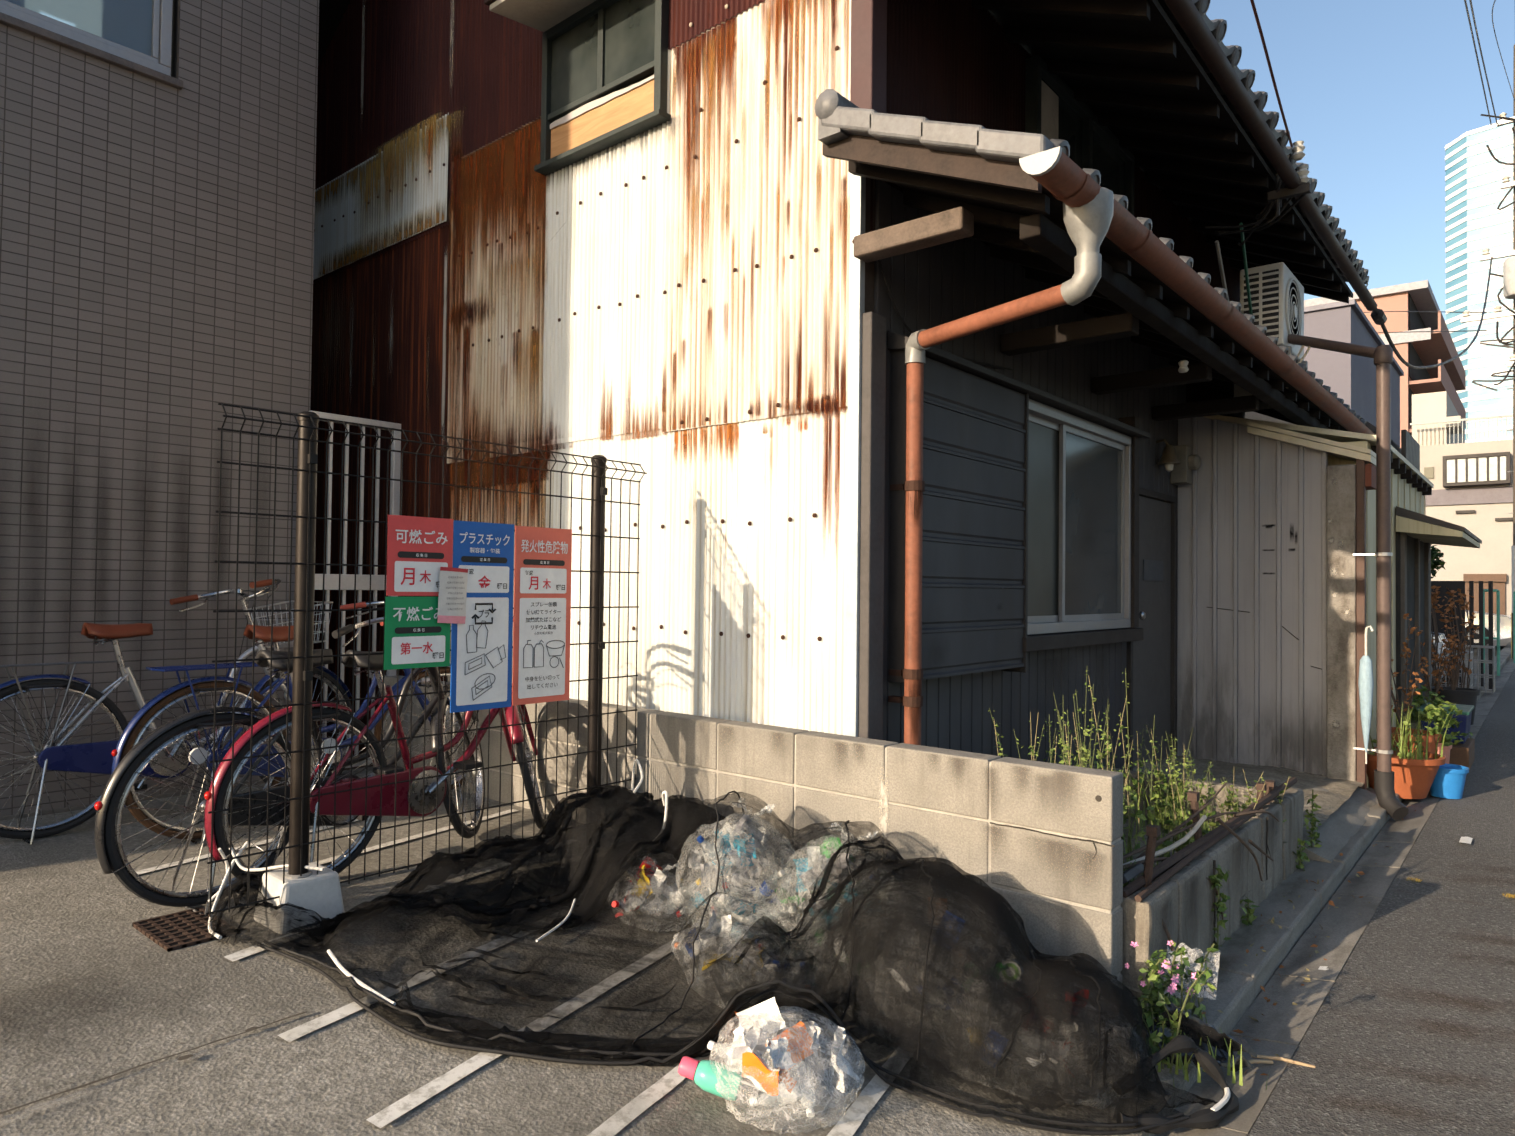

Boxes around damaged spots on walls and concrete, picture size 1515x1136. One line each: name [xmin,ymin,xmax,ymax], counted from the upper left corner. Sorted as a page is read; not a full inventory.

rust [673,17,737,170]
rust [763,0,845,145]
rust [315,112,565,525]
rust [687,185,729,273]
rust [732,241,753,308]
rust [777,190,790,223]
rust [830,178,847,269]
rust [600,315,846,528]